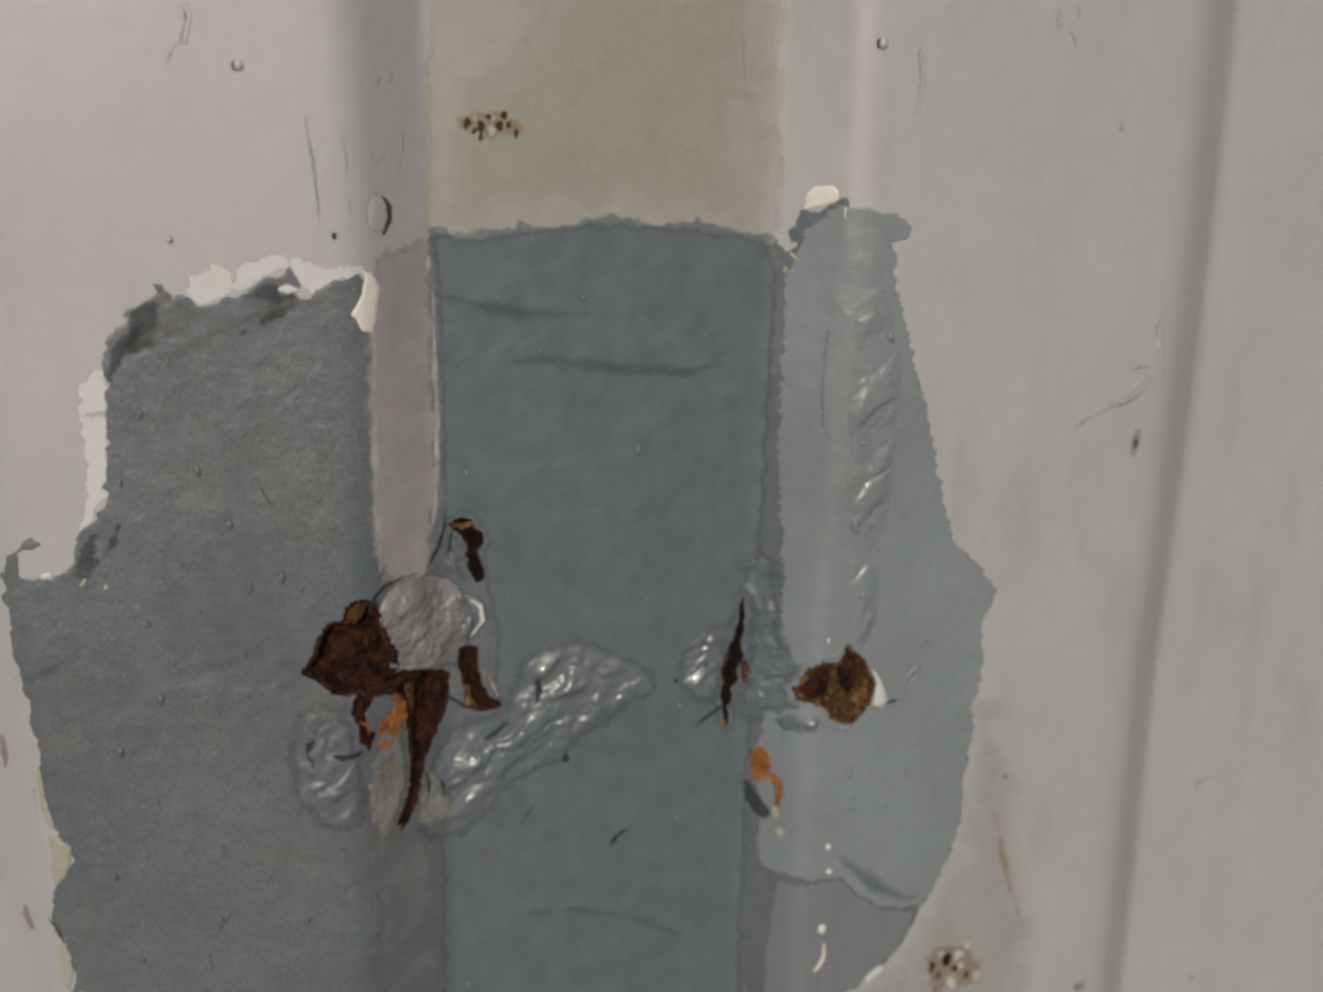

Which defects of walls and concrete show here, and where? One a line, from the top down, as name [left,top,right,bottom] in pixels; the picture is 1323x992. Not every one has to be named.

rust [463,111,519,141]
peeling [186,254,380,332]
peeling [77,369,109,534]
rust [345,602,421,749]
peeling [36,768,71,886]
peeling [51,921,73,990]